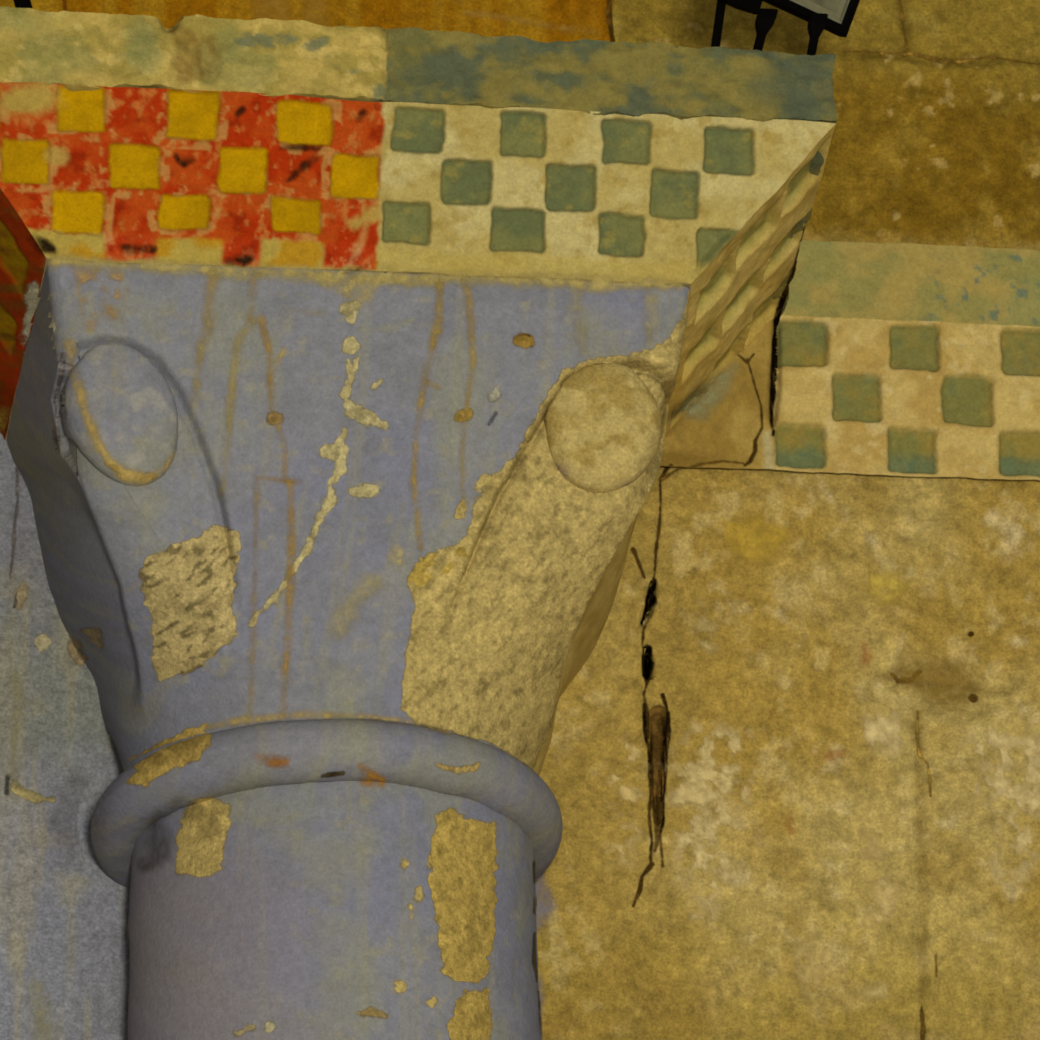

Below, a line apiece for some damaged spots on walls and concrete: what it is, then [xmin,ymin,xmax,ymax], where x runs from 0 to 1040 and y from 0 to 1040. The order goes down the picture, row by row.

peeling [138,300,389,682]
peeling [358,313,688,769]
crack [631,227,806,907]
peeling [127,723,212,787]
peeling [175,797,232,877]
peeling [394,980,407,993]
peeling [408,808,499,1040]
spalling [436,762,480,773]